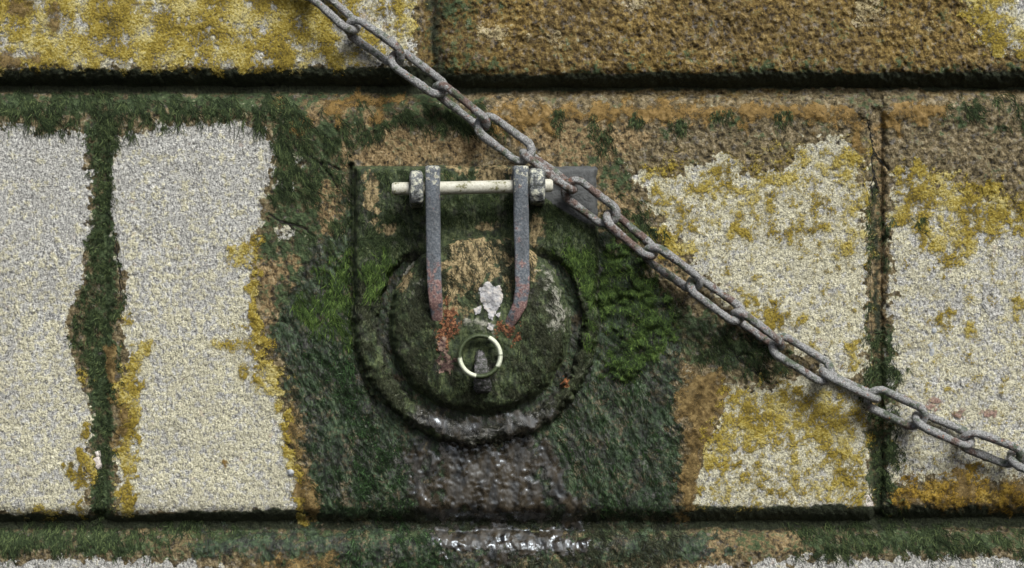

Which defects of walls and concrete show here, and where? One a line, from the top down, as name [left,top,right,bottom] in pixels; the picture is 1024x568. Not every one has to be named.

corrosion [434,296,462,374]
water stain [392,435,594,568]